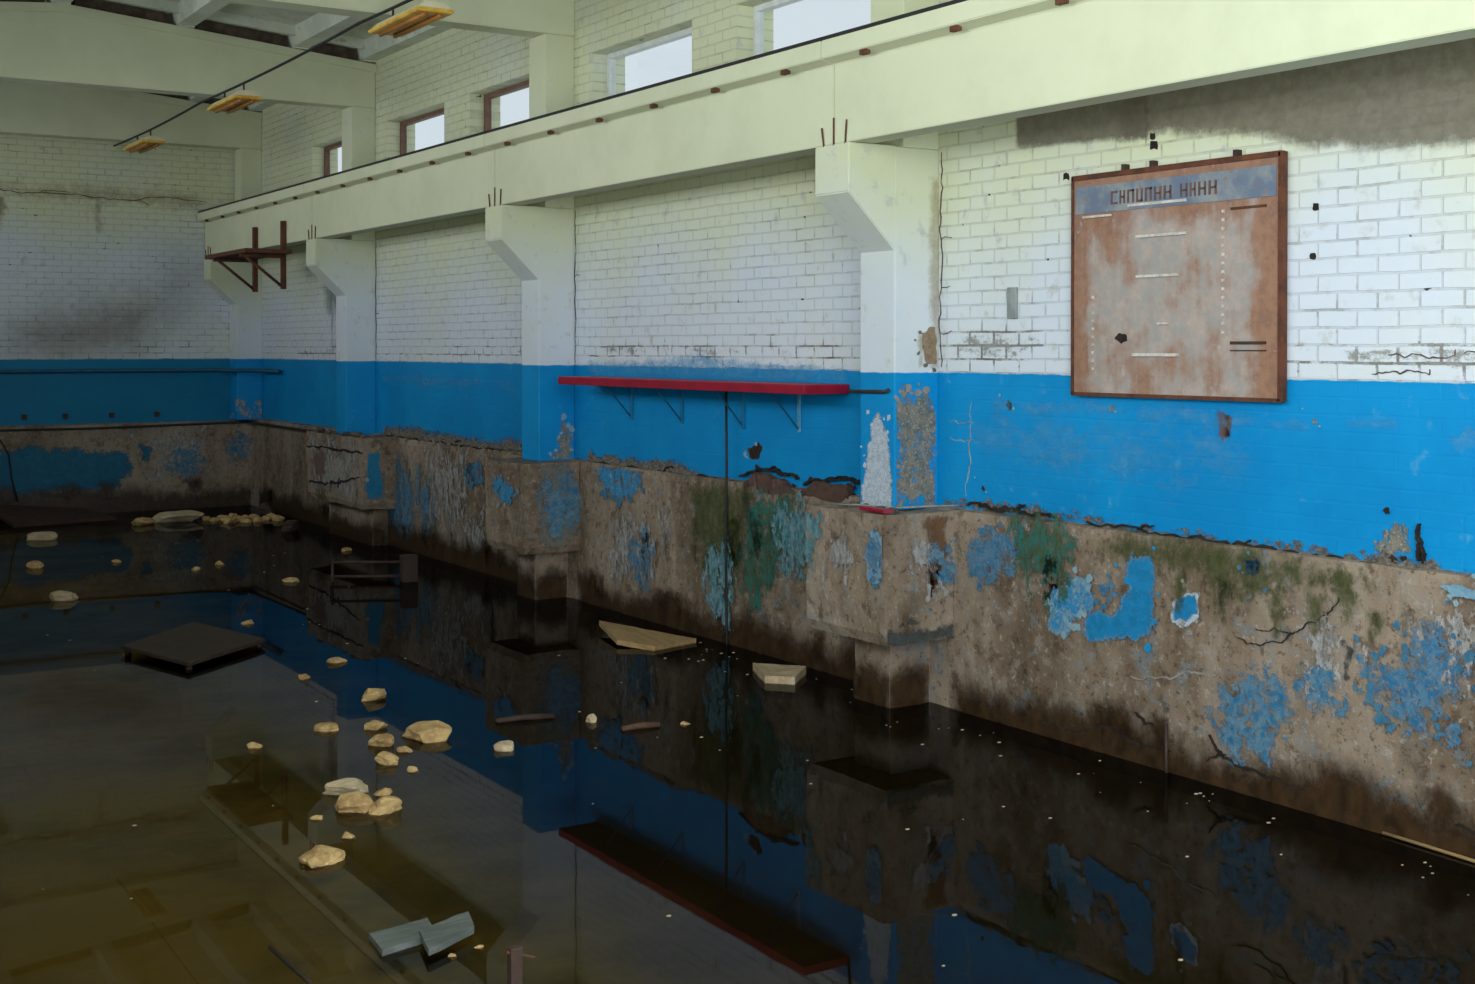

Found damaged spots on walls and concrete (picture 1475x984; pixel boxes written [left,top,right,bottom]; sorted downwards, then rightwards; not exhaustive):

leakage [1017,38,1475,147]
peeling [600,344,723,358]
peeling [0,443,208,495]
flaking render [311,424,522,544]
peeling [537,413,699,539]
flaking render [728,325,1475,653]
peeling [702,537,737,632]
leakage [1024,554,1068,617]
leakage [1176,574,1186,611]
crack [1236,597,1340,646]
peeling [1204,619,1475,768]
leakage [953,684,1475,881]